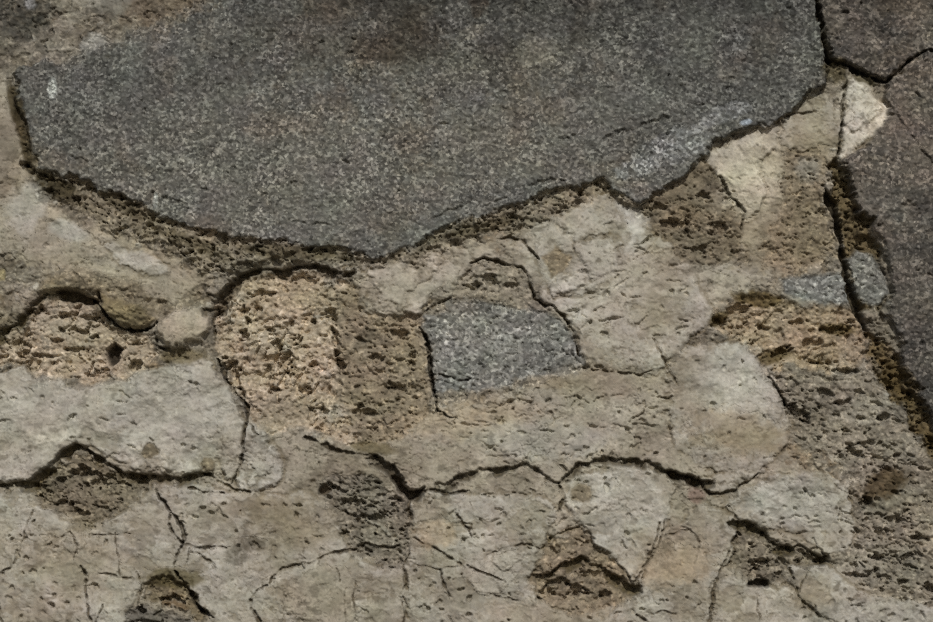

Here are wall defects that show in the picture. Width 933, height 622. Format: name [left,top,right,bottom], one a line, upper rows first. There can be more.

spalling [0,294,159,386]
spalling [36,157,640,317]
crack [418,297,479,420]
crack [470,233,678,387]
spalling [758,78,891,277]
crack [774,0,933,437]
spalling [34,455,153,529]
crack [0,263,357,622]
spalling [317,473,413,571]
crack [249,375,831,622]
spalling [470,526,633,617]
spalling [713,302,933,604]